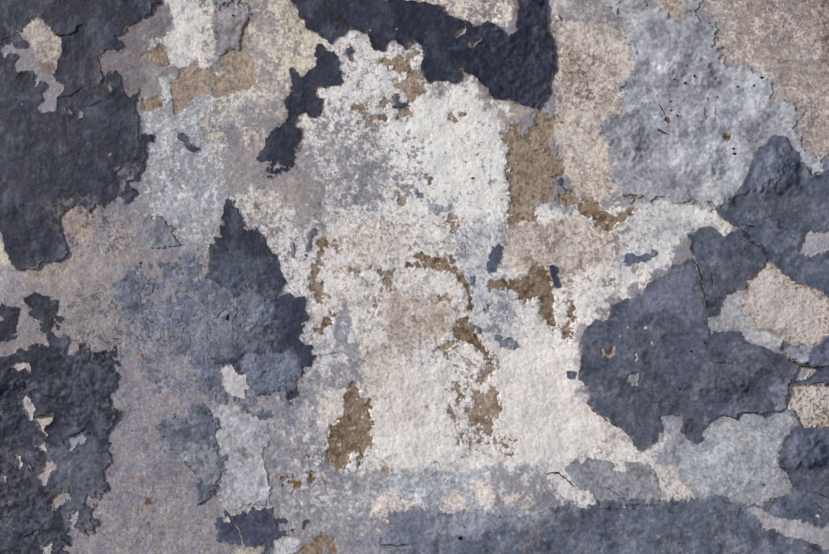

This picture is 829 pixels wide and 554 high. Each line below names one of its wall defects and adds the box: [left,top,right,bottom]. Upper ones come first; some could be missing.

peeling [0,292,120,554]
peeling [0,0,163,271]
spalling [141,43,170,67]
peeling [177,132,199,152]
peeling [112,198,340,554]
peeling [256,0,829,554]